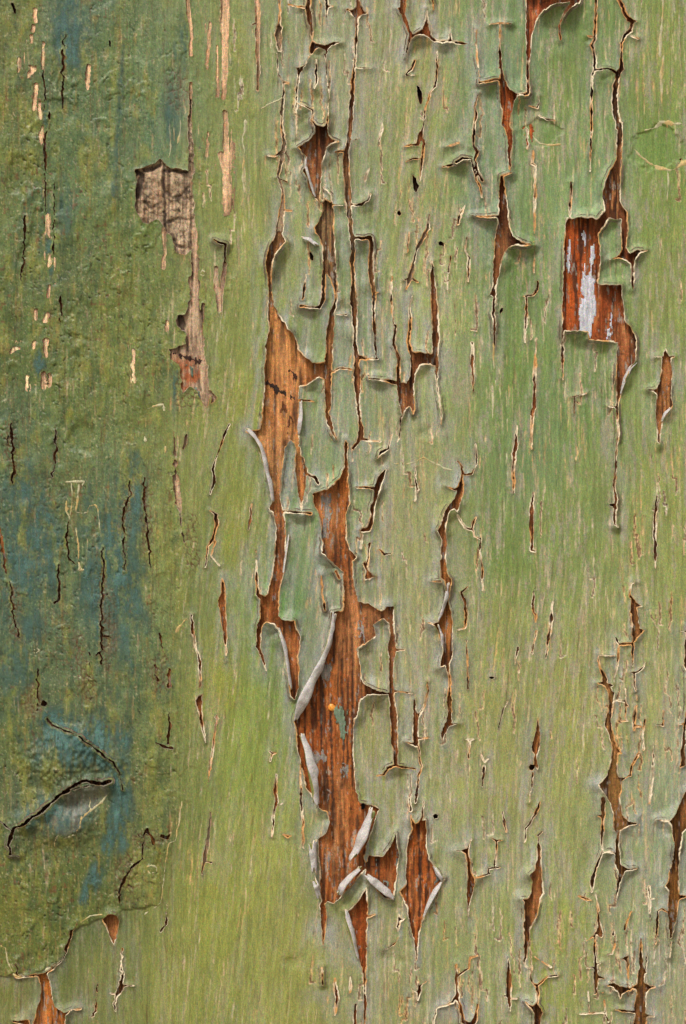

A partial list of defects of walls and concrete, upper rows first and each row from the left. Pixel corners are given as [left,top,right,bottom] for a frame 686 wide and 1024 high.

peeling [134,0,247,409]
peeling [559,122,686,530]
crack [6,422,17,484]
crack [50,427,59,478]
crack [0,528,20,637]
crack [53,521,75,604]
crack [88,477,152,665]
peeling [245,110,447,1024]
peeling [394,457,466,743]
crack [0,668,124,859]
peeling [654,792,686,958]
peeling [0,945,82,1024]